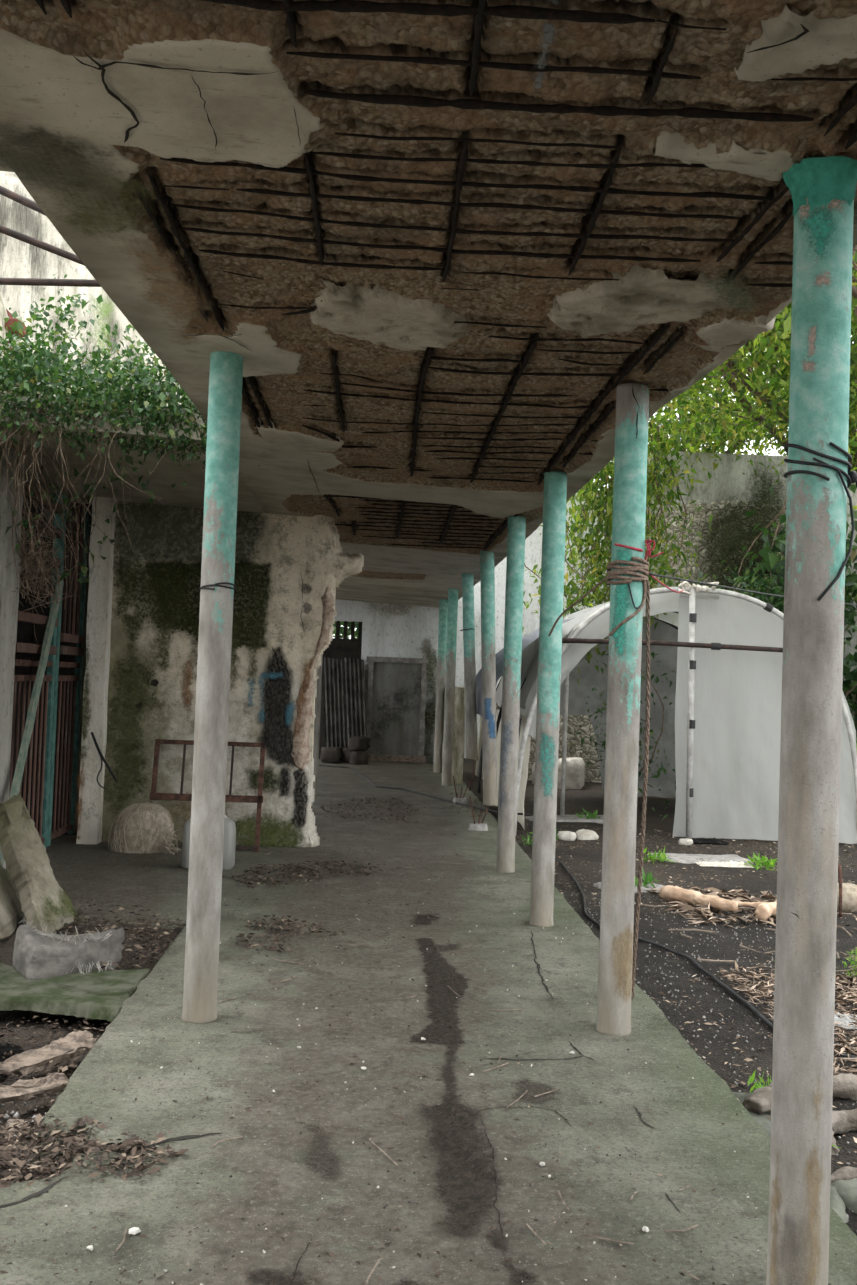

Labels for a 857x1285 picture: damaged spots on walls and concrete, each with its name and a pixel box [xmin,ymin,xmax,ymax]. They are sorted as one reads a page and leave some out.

crack [73,49,278,149]
crack [747,24,809,53]
spalling [0,0,857,555]
damp [103,501,204,811]
damp [230,511,271,685]
flaking render [290,587,335,770]
flaking render [655,500,786,604]
damp [247,767,280,792]